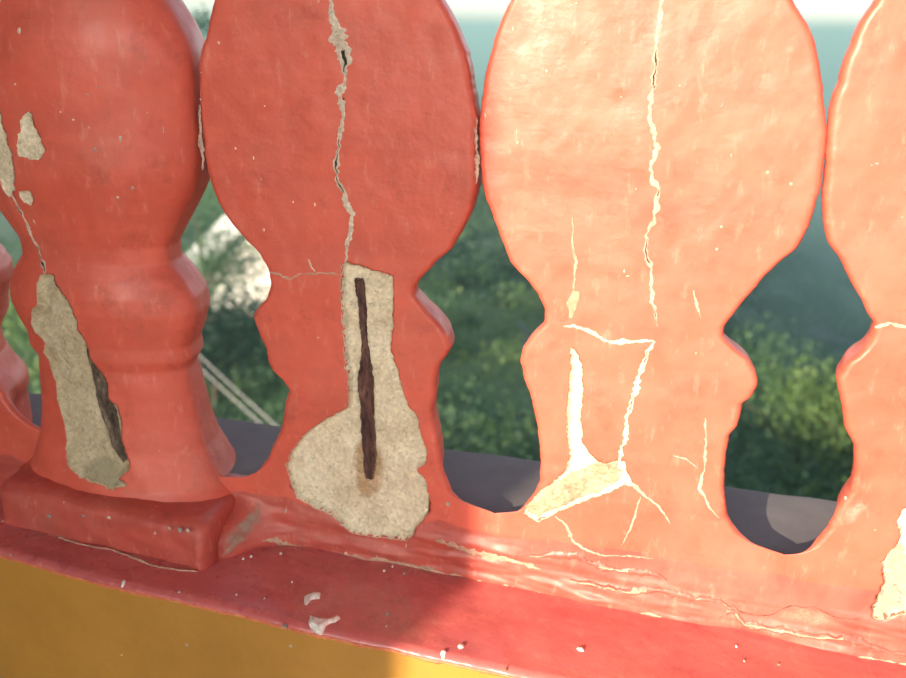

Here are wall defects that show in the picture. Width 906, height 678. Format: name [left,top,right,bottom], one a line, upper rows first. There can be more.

peeling [0,112,45,206]
crack [269,0,355,281]
crack [12,196,46,274]
crack [564,0,664,462]
spalling [31,274,130,490]
crack [51,534,197,572]
spalling [286,262,429,547]
spalling [523,348,634,522]
crack [555,482,670,559]
crack [698,419,719,518]
spalling [872,508,906,620]
crack [859,656,906,665]